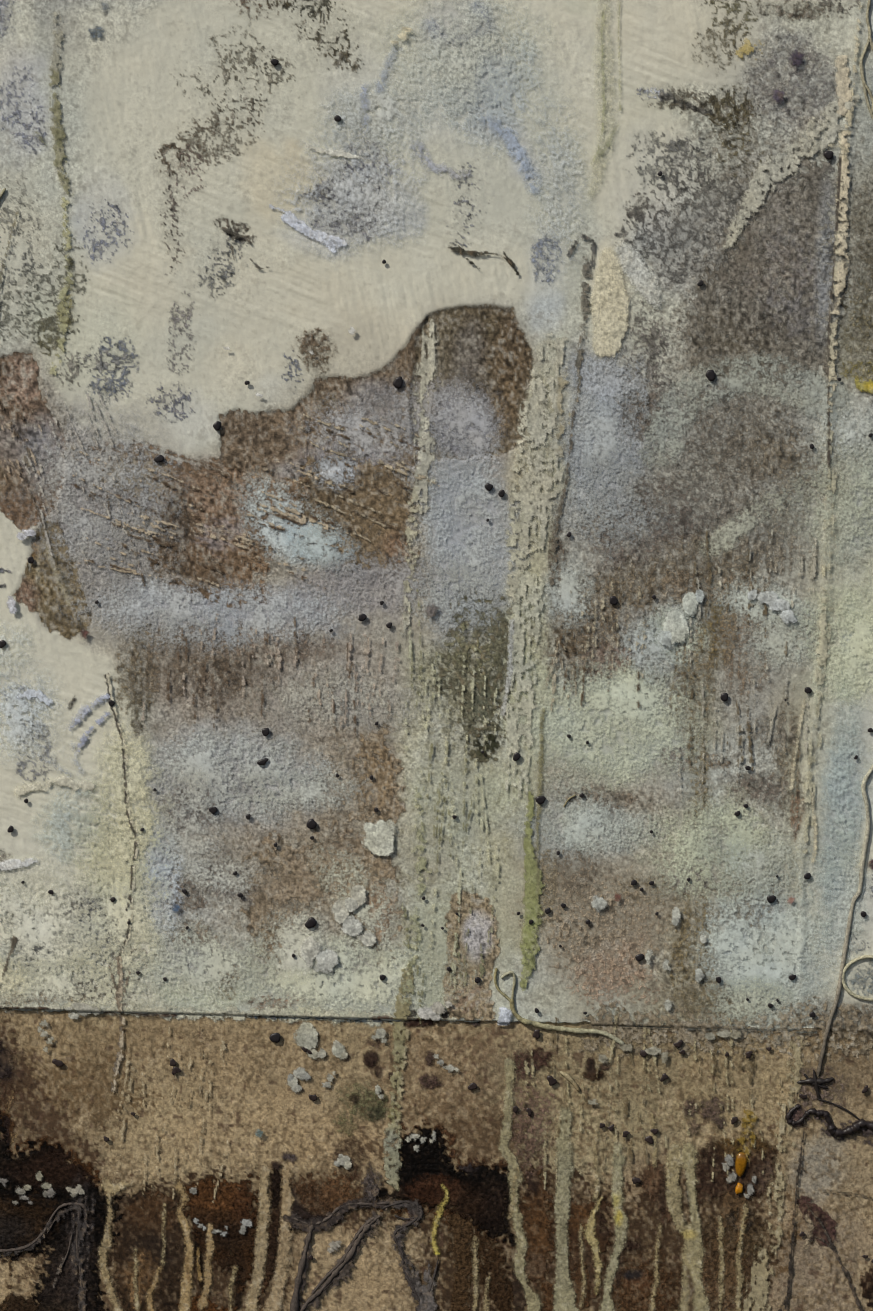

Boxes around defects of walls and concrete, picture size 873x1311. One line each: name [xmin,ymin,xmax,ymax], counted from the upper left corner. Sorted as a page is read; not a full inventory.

peeling [0,352,107,639]
peeling [219,304,534,547]
leakage [0,1040,126,1311]
leakage [582,1057,611,1081]
leakage [683,1096,728,1133]
leakage [796,1195,837,1249]